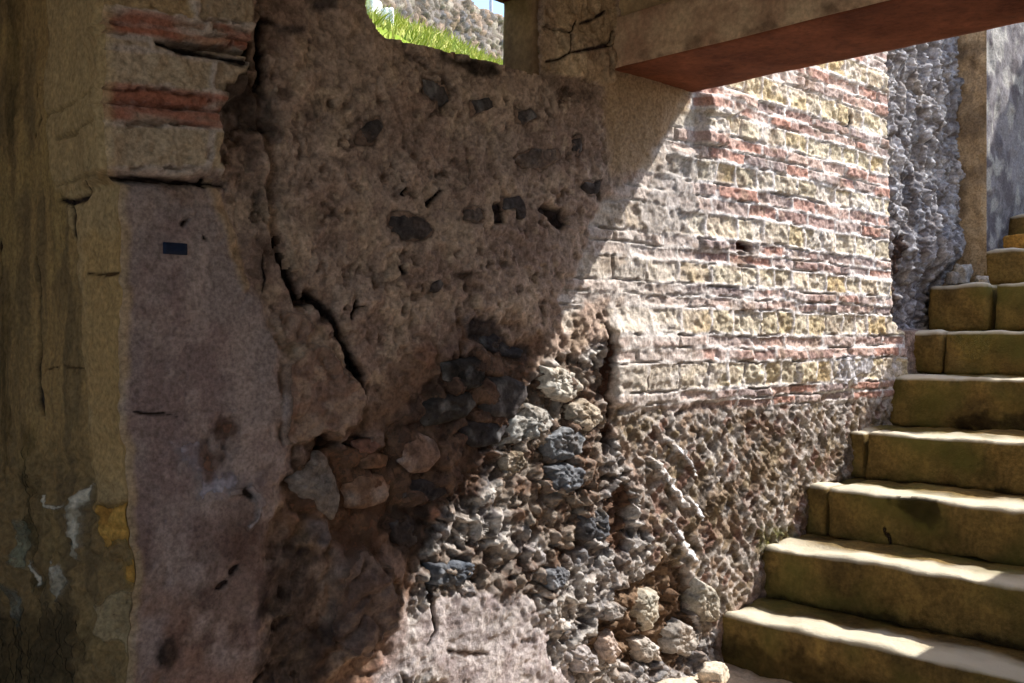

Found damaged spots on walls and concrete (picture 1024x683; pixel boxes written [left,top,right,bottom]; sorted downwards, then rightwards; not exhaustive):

crack [545,10,613,63]
crack [261,236,364,388]
peeling [836,354,875,386]
spalling [284,318,631,598]
spalling [567,558,721,674]